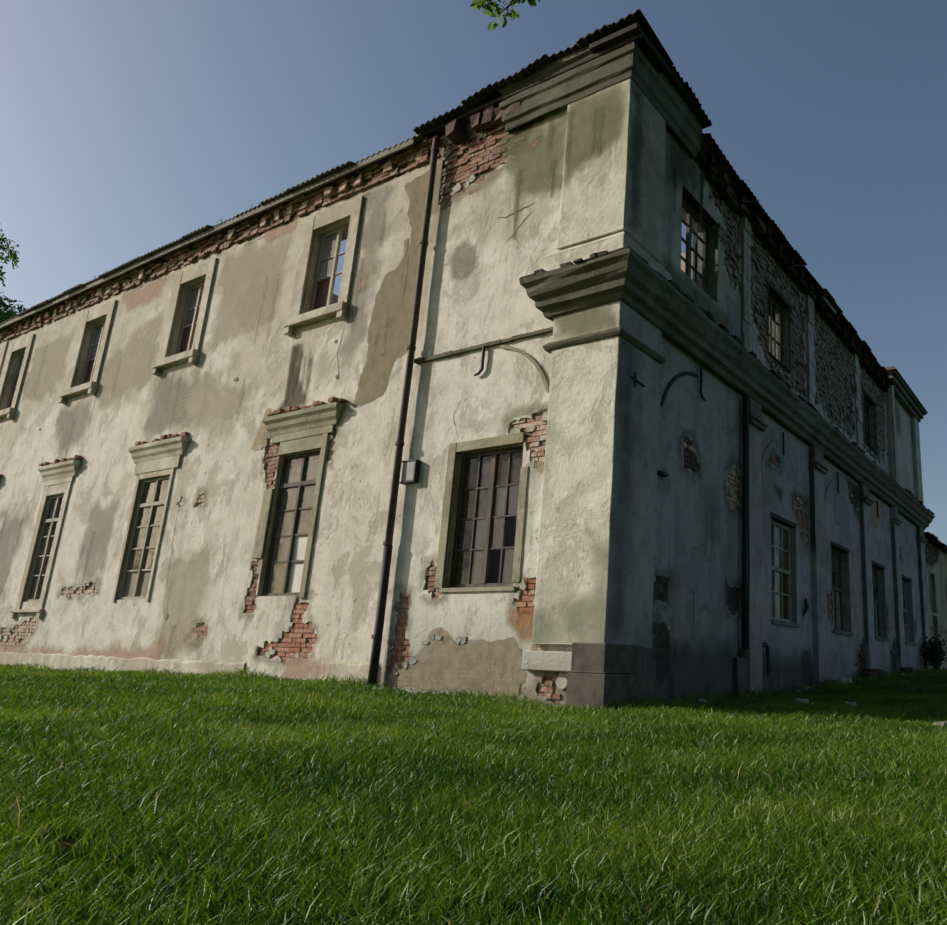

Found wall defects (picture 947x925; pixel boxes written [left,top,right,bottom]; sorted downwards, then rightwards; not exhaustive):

flaking render [432,93,541,212]
flaking render [11,173,373,334]
damp [453,245,473,278]
flaking render [704,169,886,462]
flaking render [499,405,548,472]
flaking render [680,431,701,474]
flaking render [724,463,742,512]
flaking render [240,552,267,617]
flaking render [421,552,451,603]
flaking render [0,618,38,650]
flaking render [254,595,317,665]
peeling [384,578,567,706]